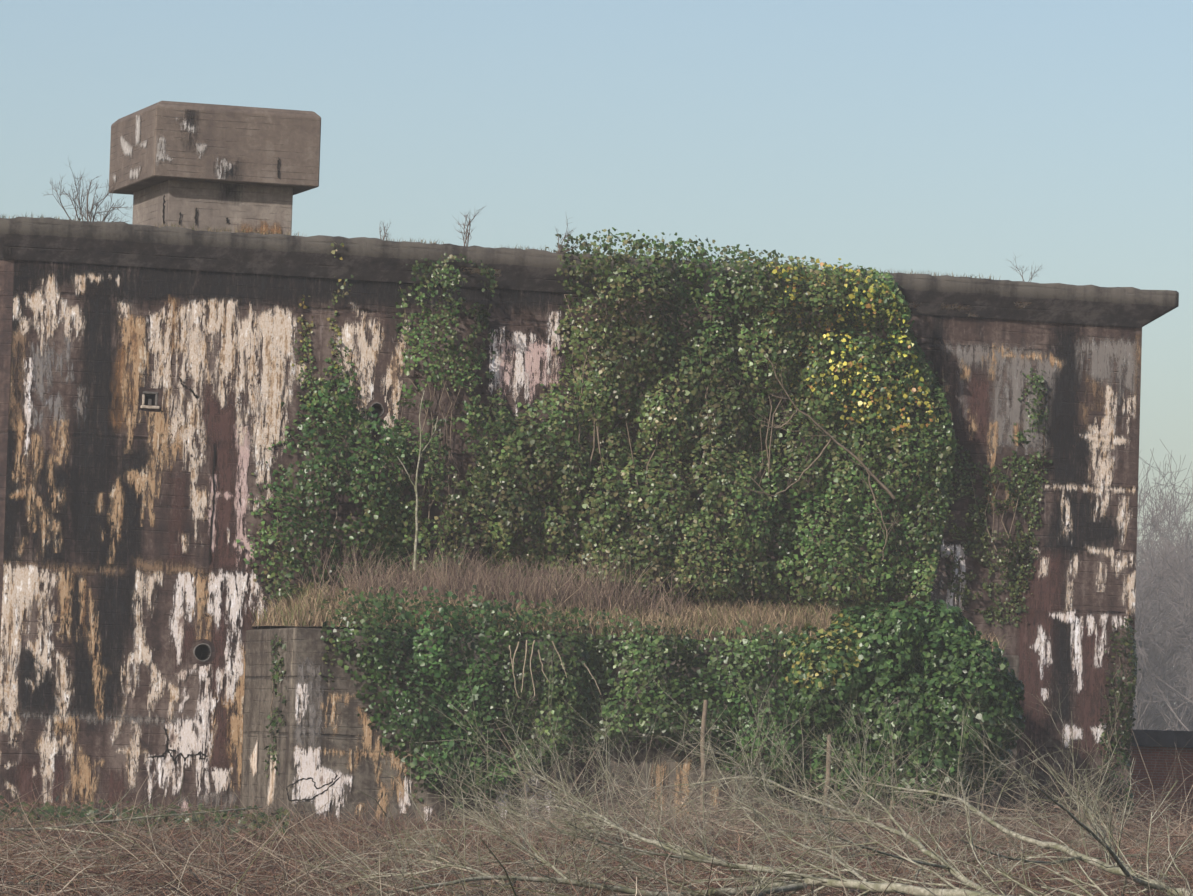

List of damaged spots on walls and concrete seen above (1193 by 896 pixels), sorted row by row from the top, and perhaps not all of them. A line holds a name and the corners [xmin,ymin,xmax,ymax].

peeling [13,274,120,355]
rust [2,382,255,597]
peeling [119,297,305,552]
leakage [3,259,564,767]
peeling [335,303,410,468]
leakage [929,315,1139,748]
peeling [1042,385,1136,521]
rust [14,759,73,808]
peeling [0,563,104,806]
peeling [120,569,264,802]
rust [174,592,257,770]
peeling [292,745,352,820]